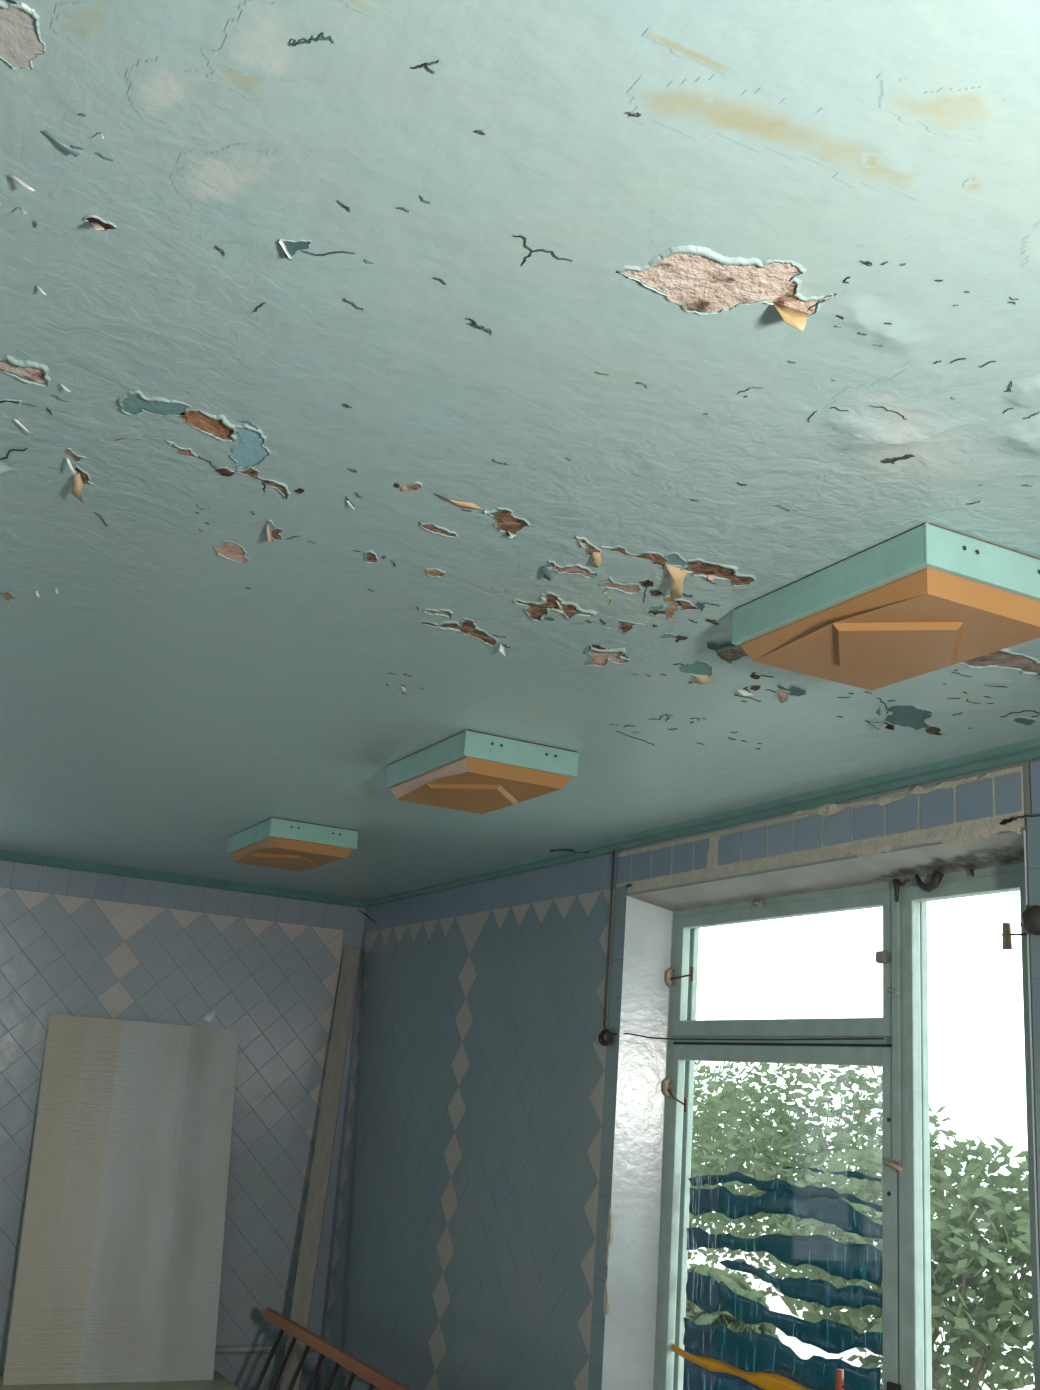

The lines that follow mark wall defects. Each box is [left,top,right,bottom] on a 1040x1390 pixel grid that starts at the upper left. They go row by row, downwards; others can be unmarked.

peeling [0,0,47,70]
crack [513,235,573,265]
peeling [616,245,850,331]
peeling [0,355,70,436]
peeling [118,390,304,500]
peeling [394,481,531,540]
peeling [426,568,446,577]
peeling [417,607,511,657]
peeling [512,536,757,685]
peeling [735,672,807,703]
peeling [837,691,949,736]
peeling [943,648,1040,729]